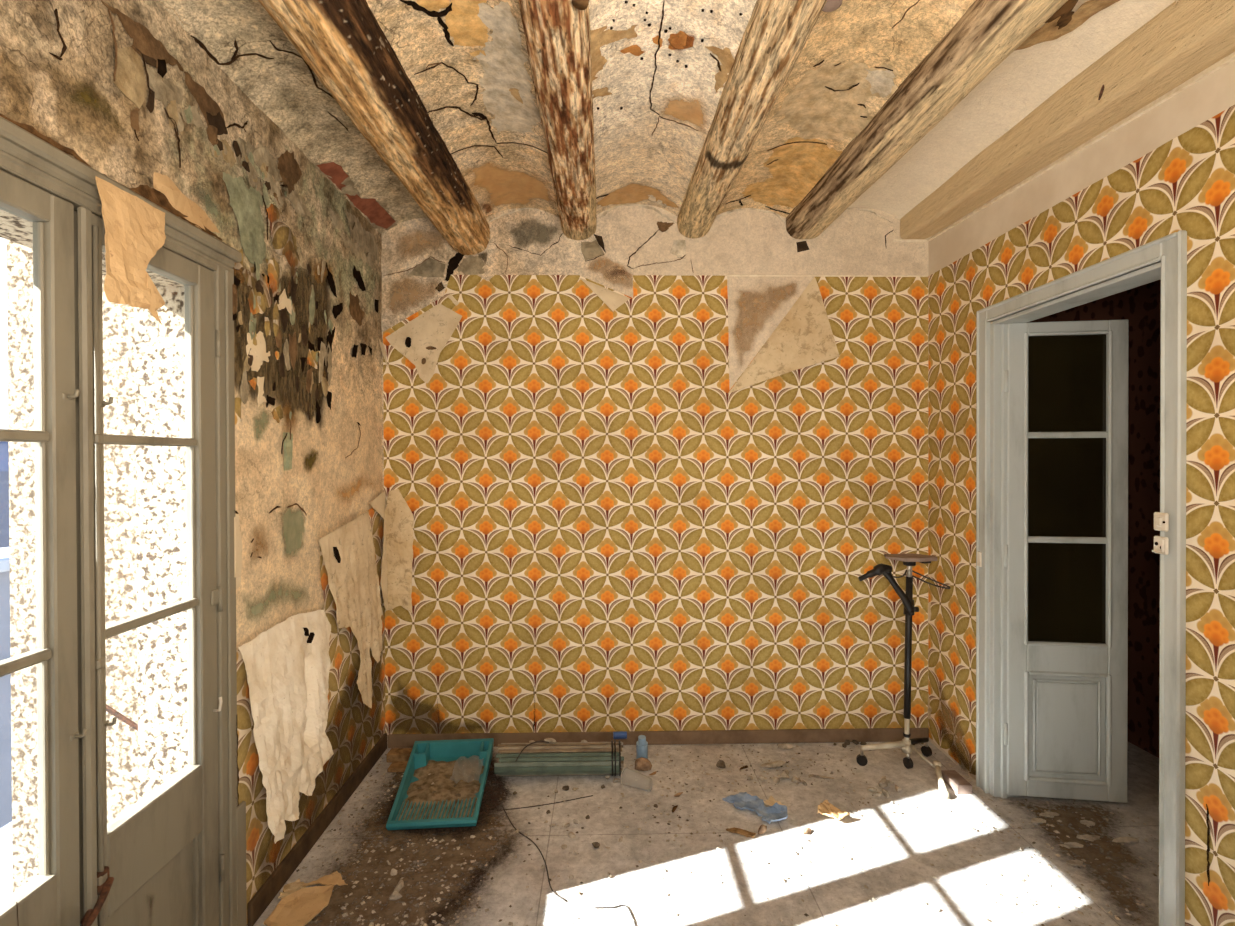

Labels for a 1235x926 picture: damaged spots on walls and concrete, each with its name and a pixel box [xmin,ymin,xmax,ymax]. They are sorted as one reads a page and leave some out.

flaking render [101,0,312,265]
crack [191,35,349,132]
flaking render [314,160,397,230]
crack [400,0,548,158]
crack [649,2,698,135]
peeling [1015,0,1120,51]